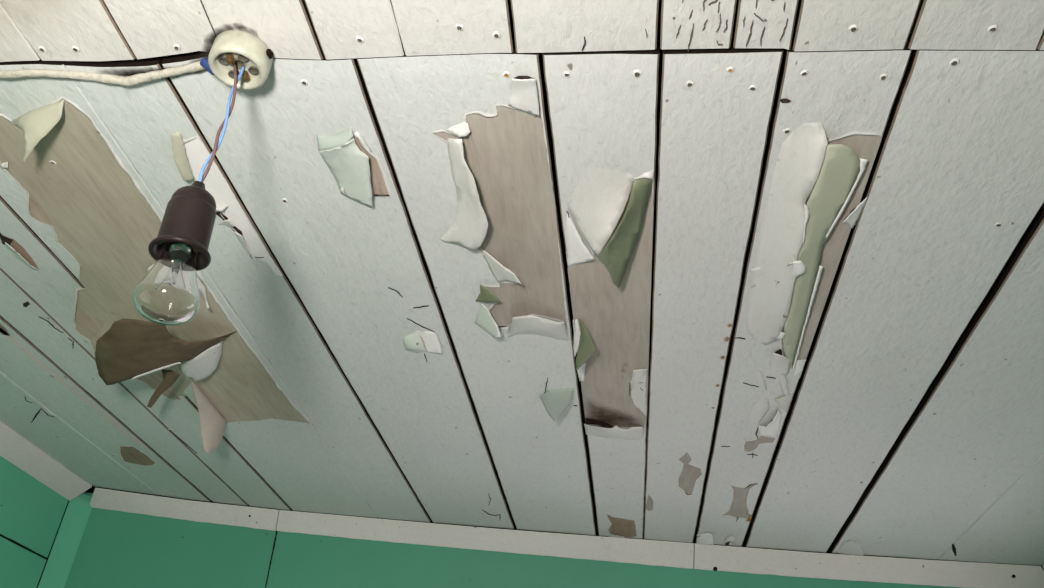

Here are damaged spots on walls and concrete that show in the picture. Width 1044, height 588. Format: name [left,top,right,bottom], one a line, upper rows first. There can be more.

crack [673,0,788,51]
peeling [317,128,391,207]
peeling [0,96,312,466]
peeling [430,76,654,440]
peeling [735,122,882,379]
peeling [403,318,442,361]
peeling [742,436,777,458]
peeling [676,451,704,495]
peeling [605,513,638,538]